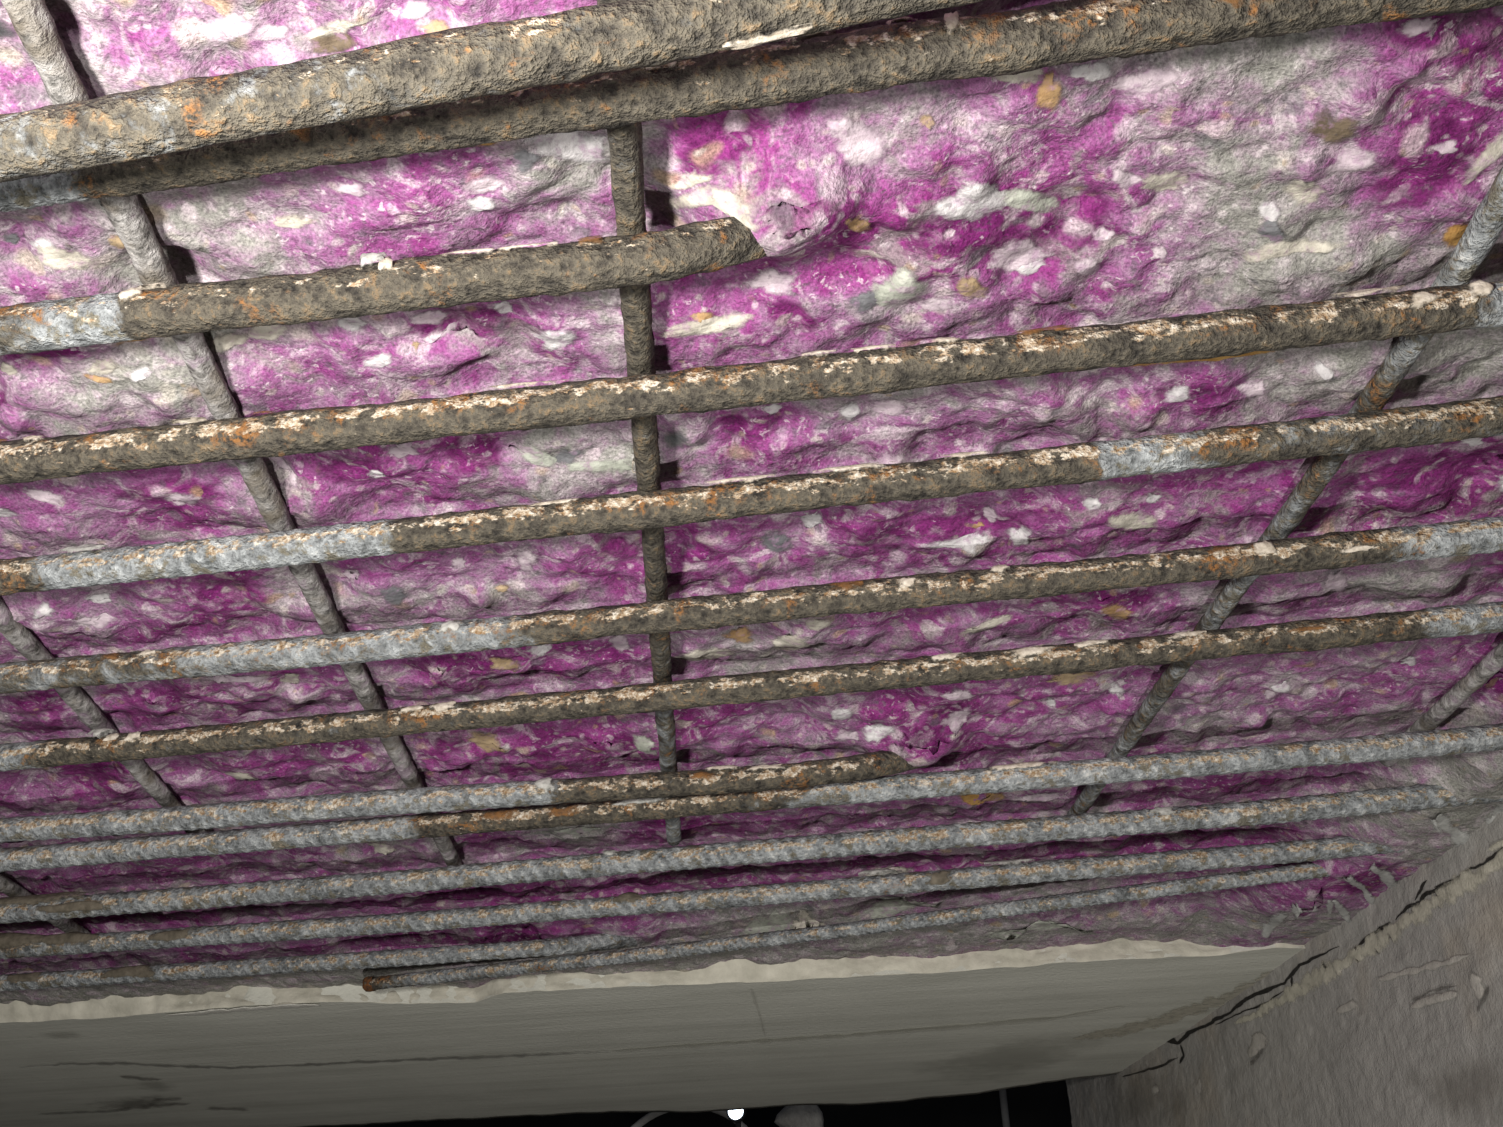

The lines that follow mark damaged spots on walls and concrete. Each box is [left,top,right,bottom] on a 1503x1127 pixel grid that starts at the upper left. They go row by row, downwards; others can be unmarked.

spalling [0,0,1503,559]
spalling [0,395,1503,1023]
crack [1115,847,1503,1077]